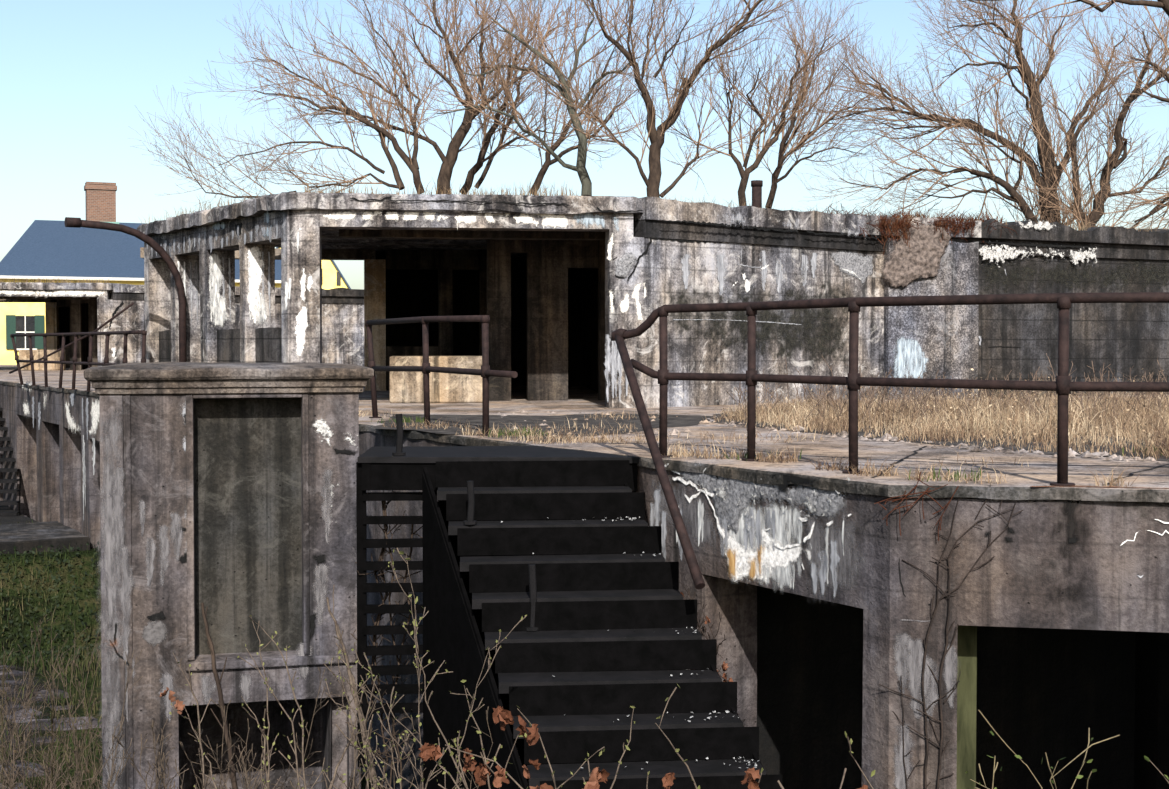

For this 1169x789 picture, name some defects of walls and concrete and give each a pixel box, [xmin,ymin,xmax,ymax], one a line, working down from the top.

peeling [285,269,313,355]
peeling [605,335,628,402]
spalling [664,459,850,534]